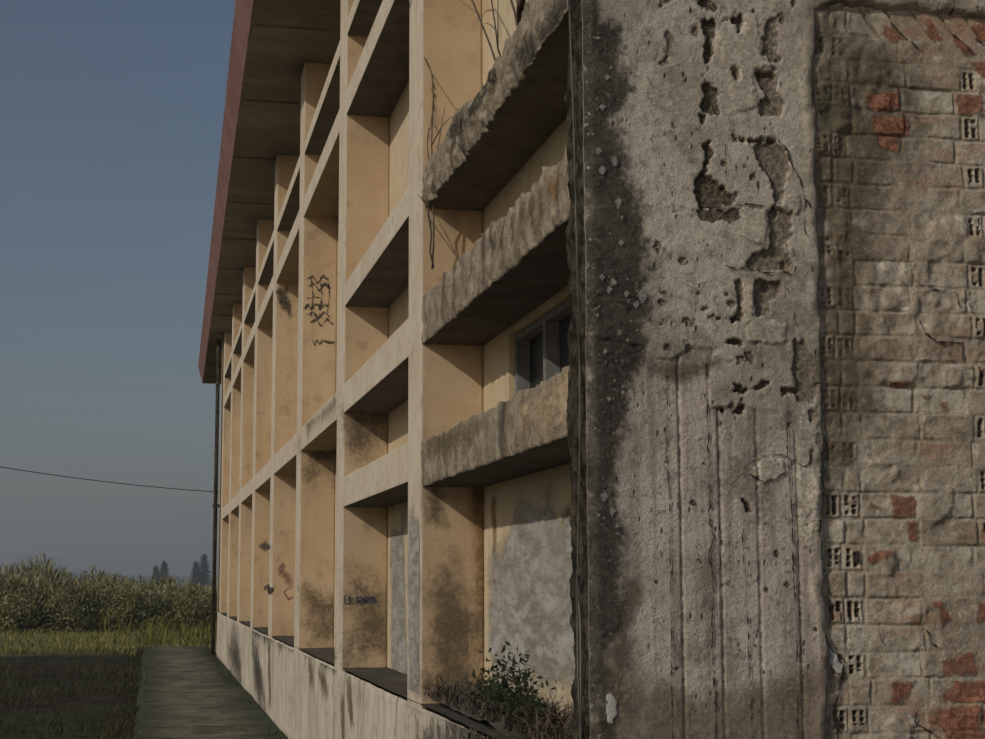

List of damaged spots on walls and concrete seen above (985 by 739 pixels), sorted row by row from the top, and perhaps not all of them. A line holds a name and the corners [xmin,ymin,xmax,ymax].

peeling [692,0,796,124]
peeling [926,19,985,78]
crack [944,2,983,53]
peeling [865,91,909,152]
damp [582,0,832,739]
crack [705,362,845,739]
peeling [870,494,918,542]
damp [227,621,290,705]
damp [305,583,388,691]
damp [340,678,353,739]
damp [425,572,484,689]
peeling [904,653,985,739]